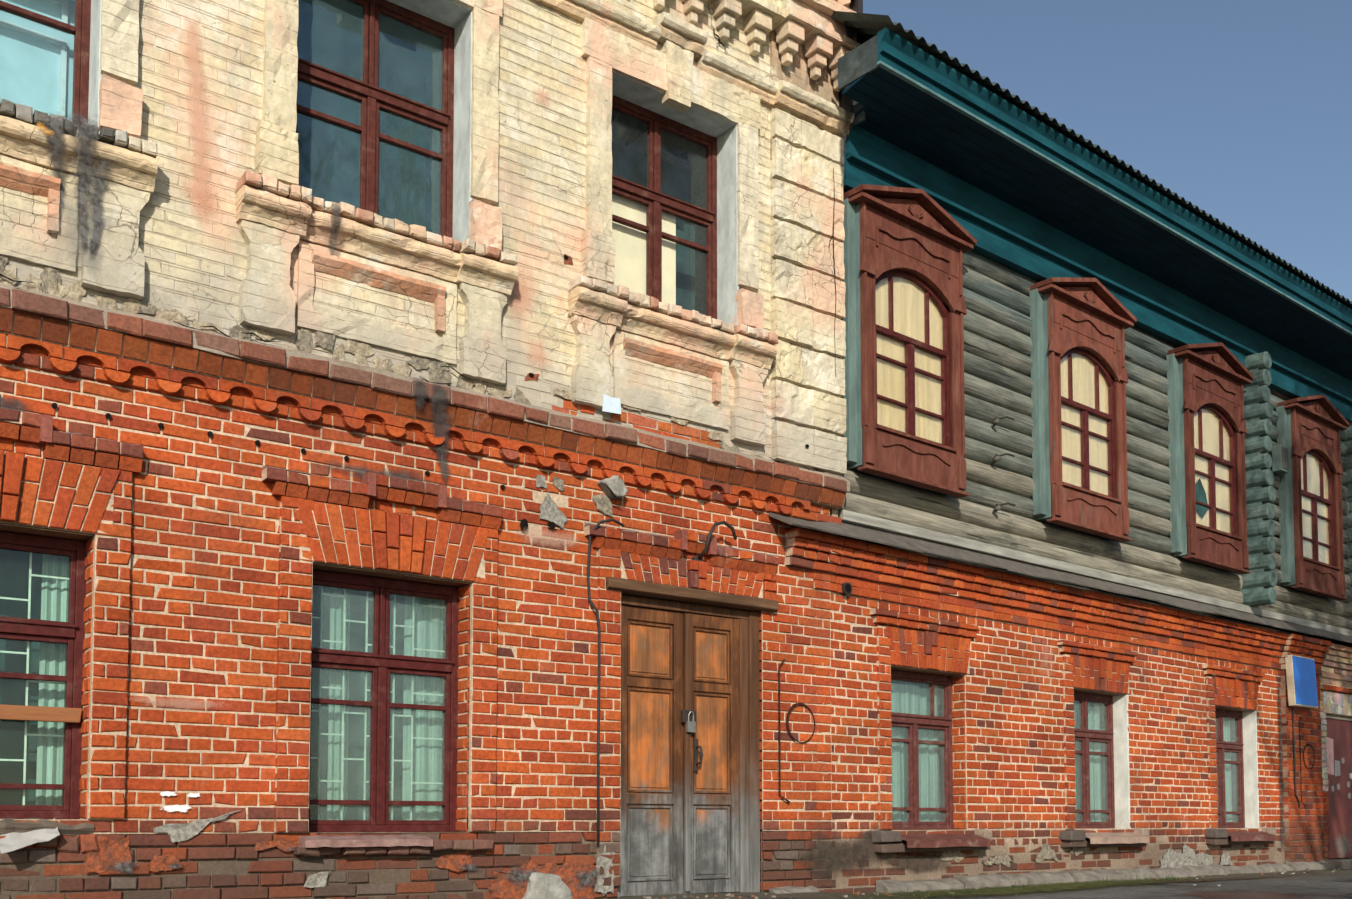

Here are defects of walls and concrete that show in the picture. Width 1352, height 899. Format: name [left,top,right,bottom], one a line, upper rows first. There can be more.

damp [37,114,111,255]
flaking render [0,255,539,405]
spalling [552,387,785,463]
spalling [84,835,183,874]
spalling [254,837,300,852]
spalling [436,850,476,872]
spalling [488,860,598,899]